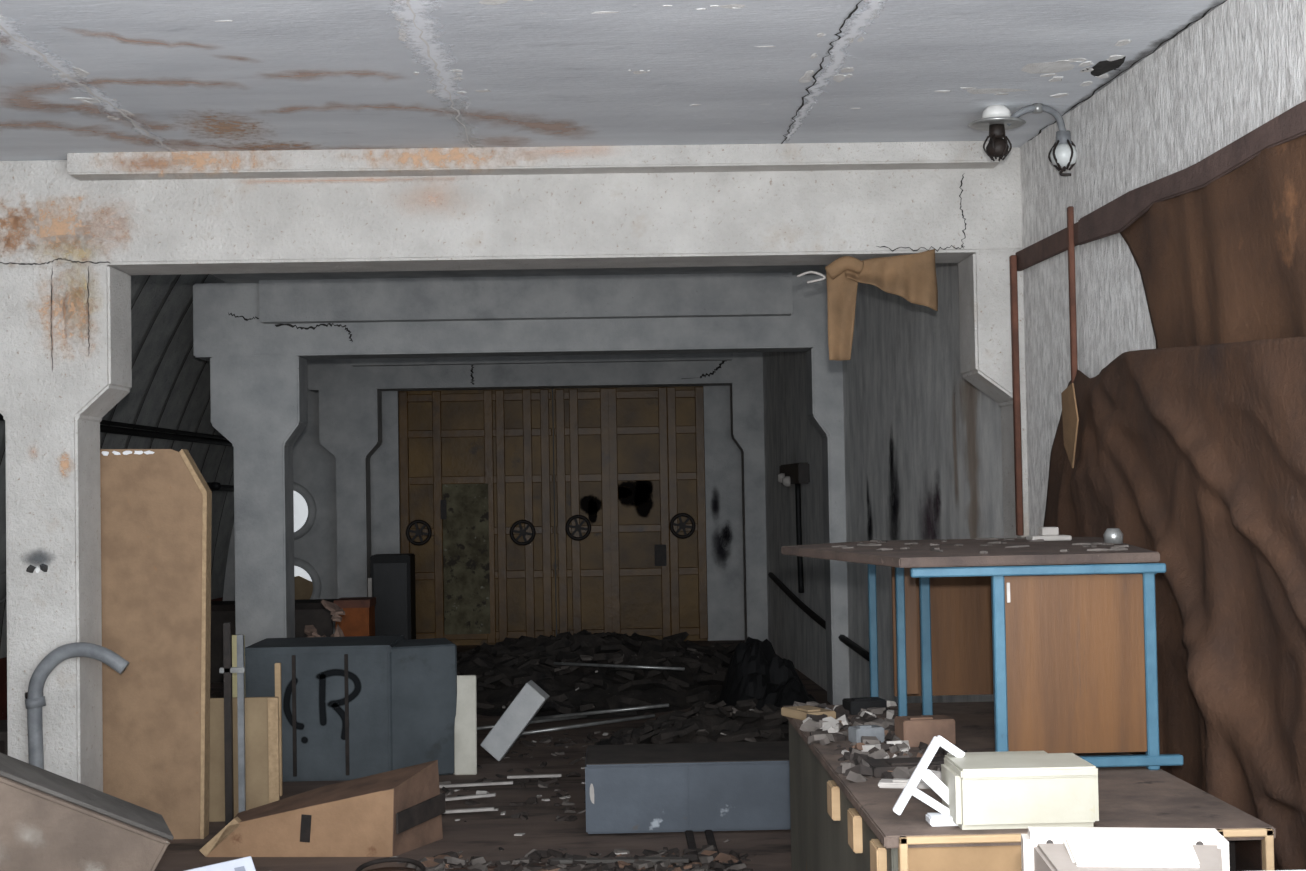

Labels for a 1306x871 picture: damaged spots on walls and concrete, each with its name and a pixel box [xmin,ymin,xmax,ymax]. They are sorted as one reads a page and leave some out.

crack [0,15,177,152]
crack [391,0,491,148]
crack [781,0,885,144]
spalling [1021,3,1219,110]
corrosion [112,116,300,174]
corrosion [370,148,491,167]
corrosion [0,197,95,254]
crack [877,173,966,252]
crack [228,313,353,342]